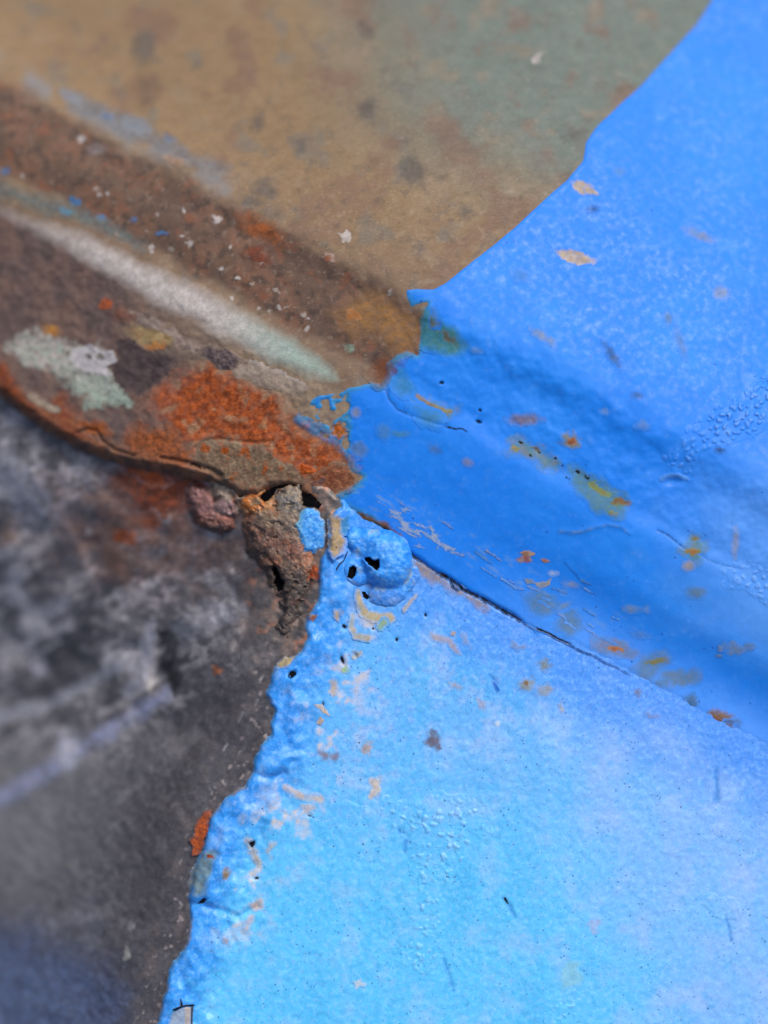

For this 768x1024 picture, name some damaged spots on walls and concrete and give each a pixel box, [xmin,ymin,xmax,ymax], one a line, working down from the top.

peeling [57,85,237,183]
peeling [570,179,602,214]
peeling [0,167,342,414]
peeling [554,248,598,266]
rust [0,356,364,595]
rust [502,428,635,523]
peeling [260,484,617,728]
crack [412,555,631,675]
peeling [423,728,443,752]
rust [186,808,234,902]
peeling [242,835,278,880]
peeling [168,998,195,1024]